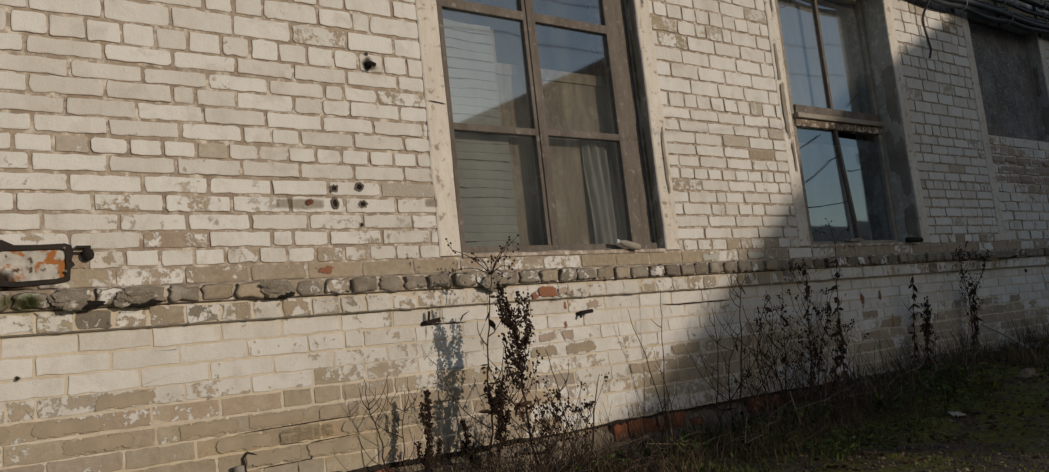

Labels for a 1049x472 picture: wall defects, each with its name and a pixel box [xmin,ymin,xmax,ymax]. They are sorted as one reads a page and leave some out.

spalling [47,286,163,311]
spalling [260,279,295,298]
spalling [481,272,507,292]
peeling [531,286,596,358]
peeling [860,290,922,351]
peeling [630,336,751,385]
peeling [31,390,156,455]